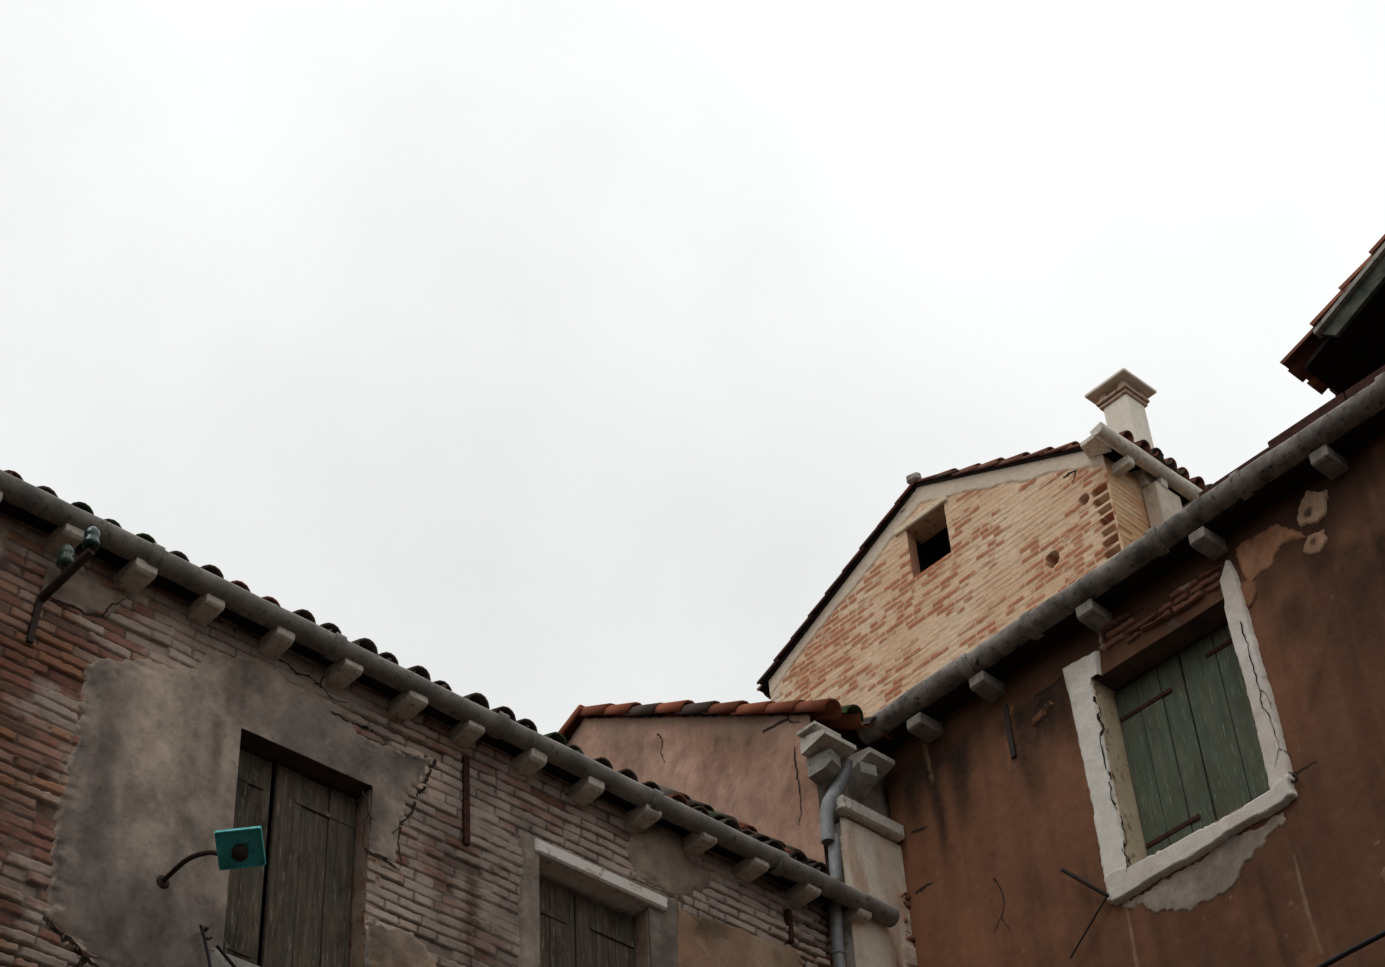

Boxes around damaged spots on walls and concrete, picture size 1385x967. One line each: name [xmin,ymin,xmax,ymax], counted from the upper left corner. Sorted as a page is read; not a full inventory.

flaking render [1098,490,1328,651]
crack [1240,621,1316,774]
crack [362,759,437,870]